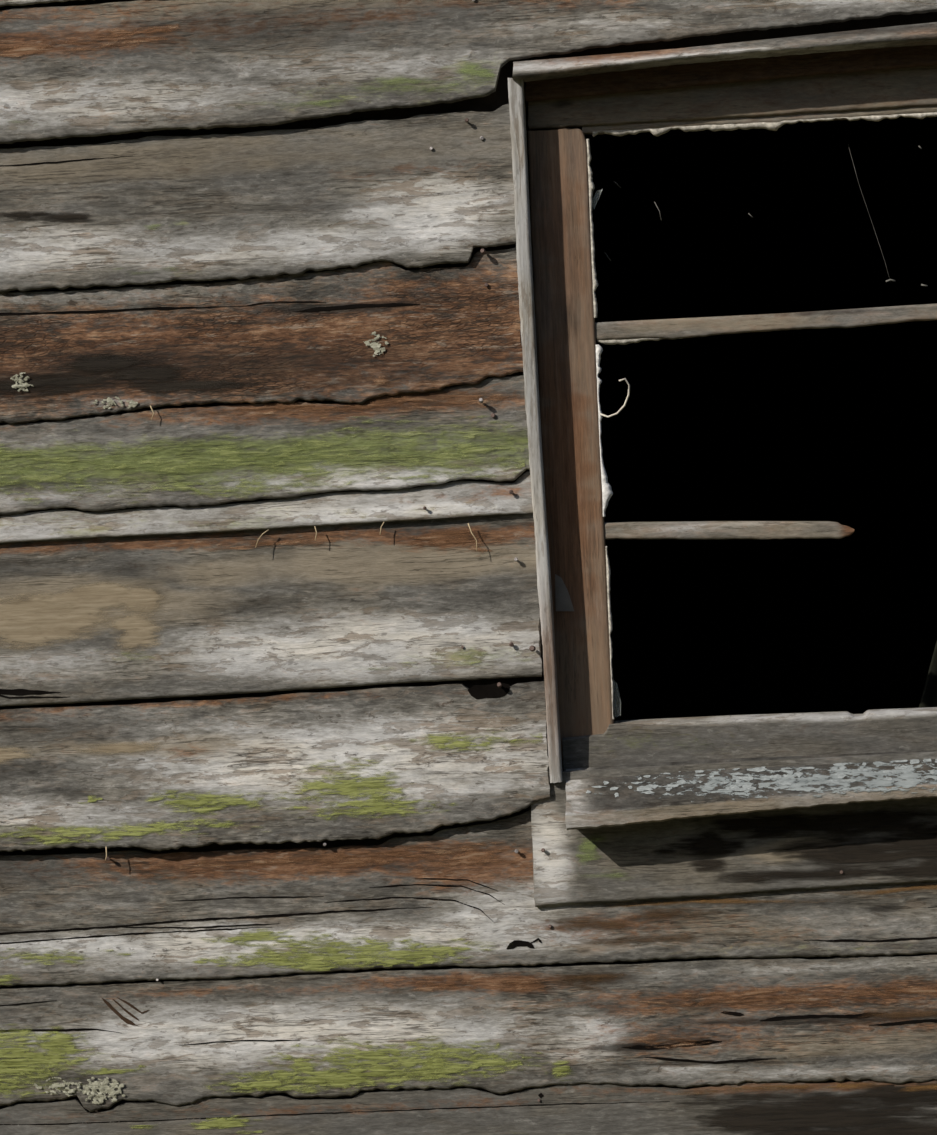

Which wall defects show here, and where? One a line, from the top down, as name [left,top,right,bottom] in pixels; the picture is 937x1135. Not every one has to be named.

peeling [586,759,937,800]
damp [655,810,937,882]
crack [721,1011,937,1026]
crack [623,1040,774,1064]
damp [681,1083,937,1135]